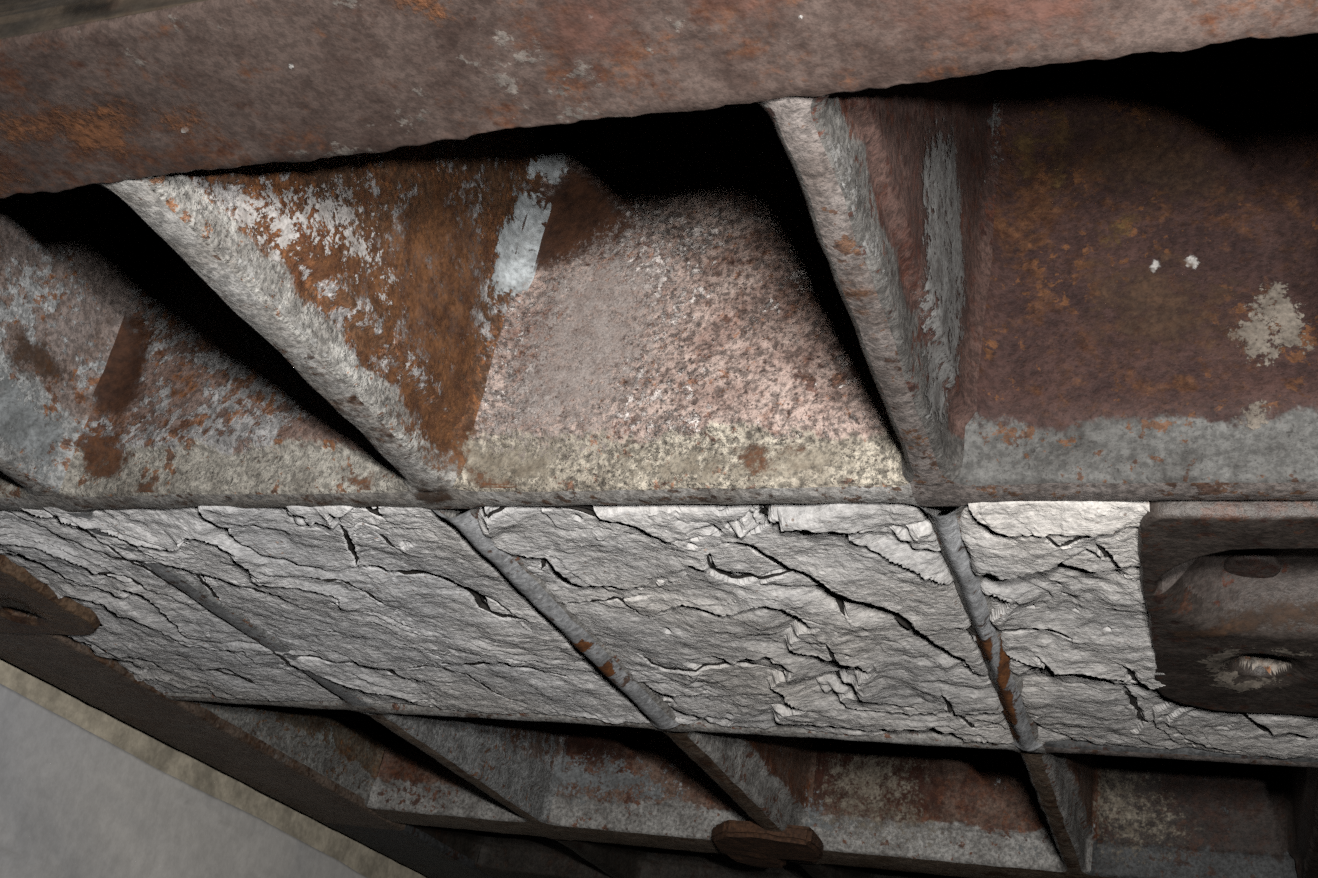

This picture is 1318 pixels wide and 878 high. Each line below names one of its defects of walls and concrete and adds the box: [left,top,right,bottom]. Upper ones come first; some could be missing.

corrosion [92,316,149,414]
corrosion [296,178,515,488]
corrosion [72,433,133,480]
corrosion [737,446,769,476]
crack [7,506,526,700]
crack [541,558,625,603]
crack [543,505,647,533]
crack [707,544,845,616]
crack [1045,535,1118,569]
crack [644,644,858,697]
corrosion [975,634,1020,741]
corrosion [813,739,944,819]